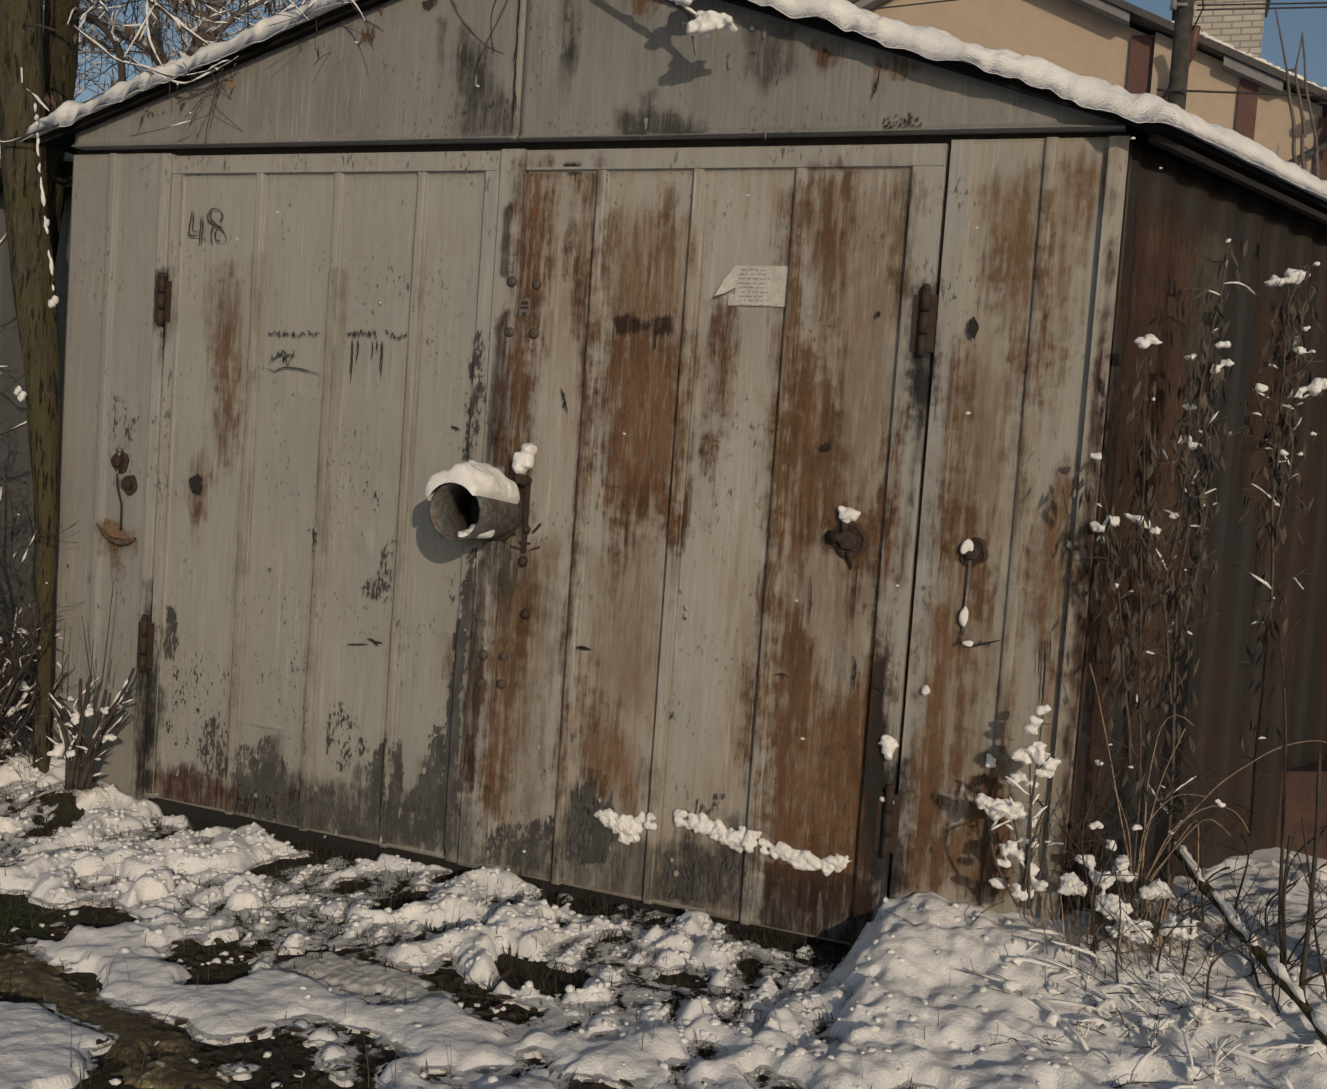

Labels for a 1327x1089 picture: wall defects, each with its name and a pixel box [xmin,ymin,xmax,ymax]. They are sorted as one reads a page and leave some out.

corrosion [216,274,241,449]
water stain [622,113,701,134]
corrosion [766,171,853,559]
corrosion [983,173,1070,372]
corrosion [1063,160,1105,229]
corrosion [487,156,738,807]
corrosion [871,406,909,577]
corrosion [143,764,301,819]
corrosion [458,559,538,802]
water stain [499,805,745,910]
corrosion [739,563,892,944]
corrosion [900,458,1019,901]